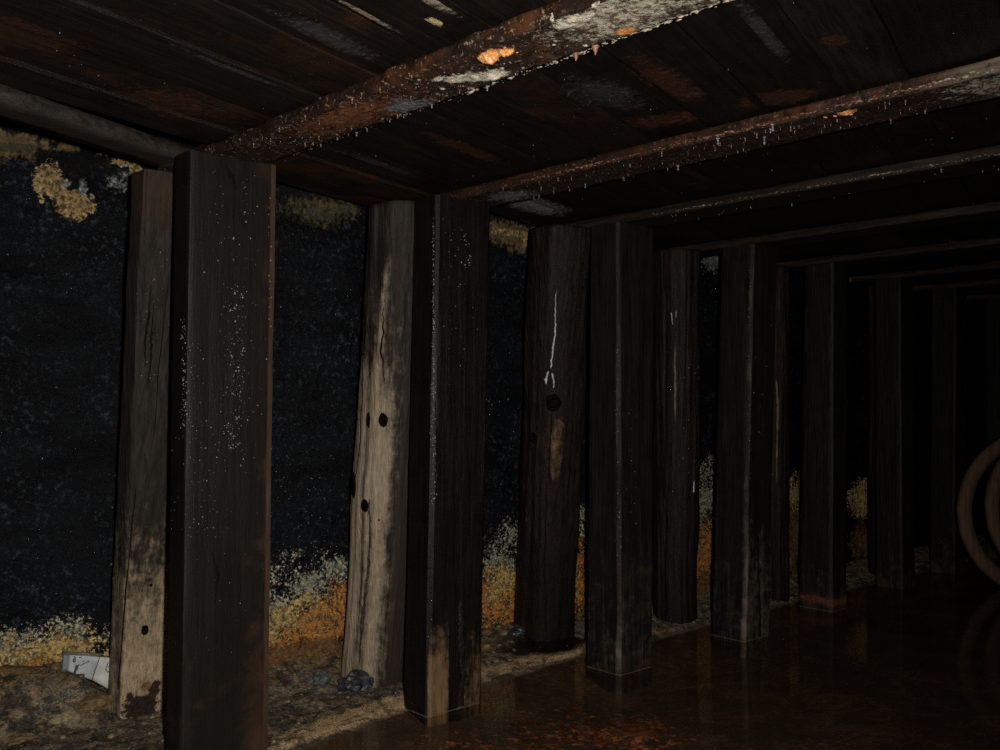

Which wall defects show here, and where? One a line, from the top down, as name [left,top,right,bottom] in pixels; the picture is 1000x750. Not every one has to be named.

crack [143,278,169,433]
crack [355,308,385,479]
damp [544,295,556,388]